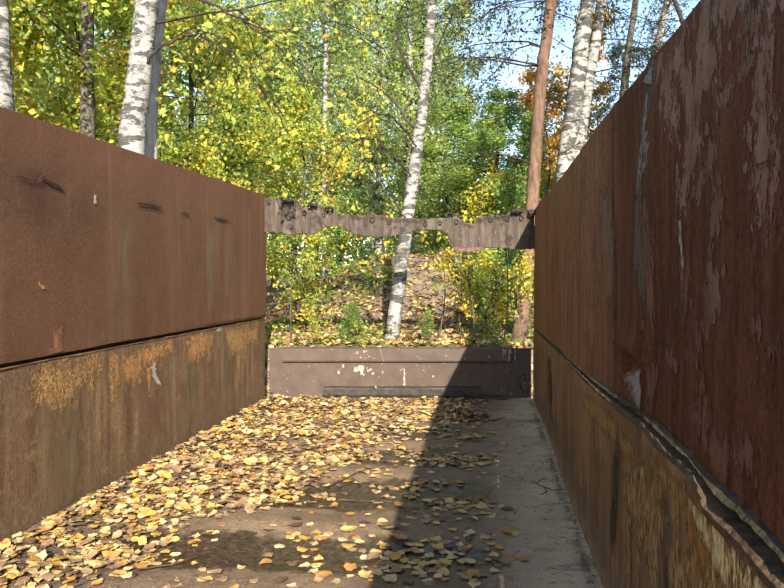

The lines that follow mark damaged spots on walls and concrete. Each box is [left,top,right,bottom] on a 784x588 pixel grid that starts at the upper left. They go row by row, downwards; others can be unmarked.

peeling [652,0,784,489]
rust [29,331,174,419]
rust [184,331,214,367]
rust [225,324,259,381]
rust [620,457,766,588]